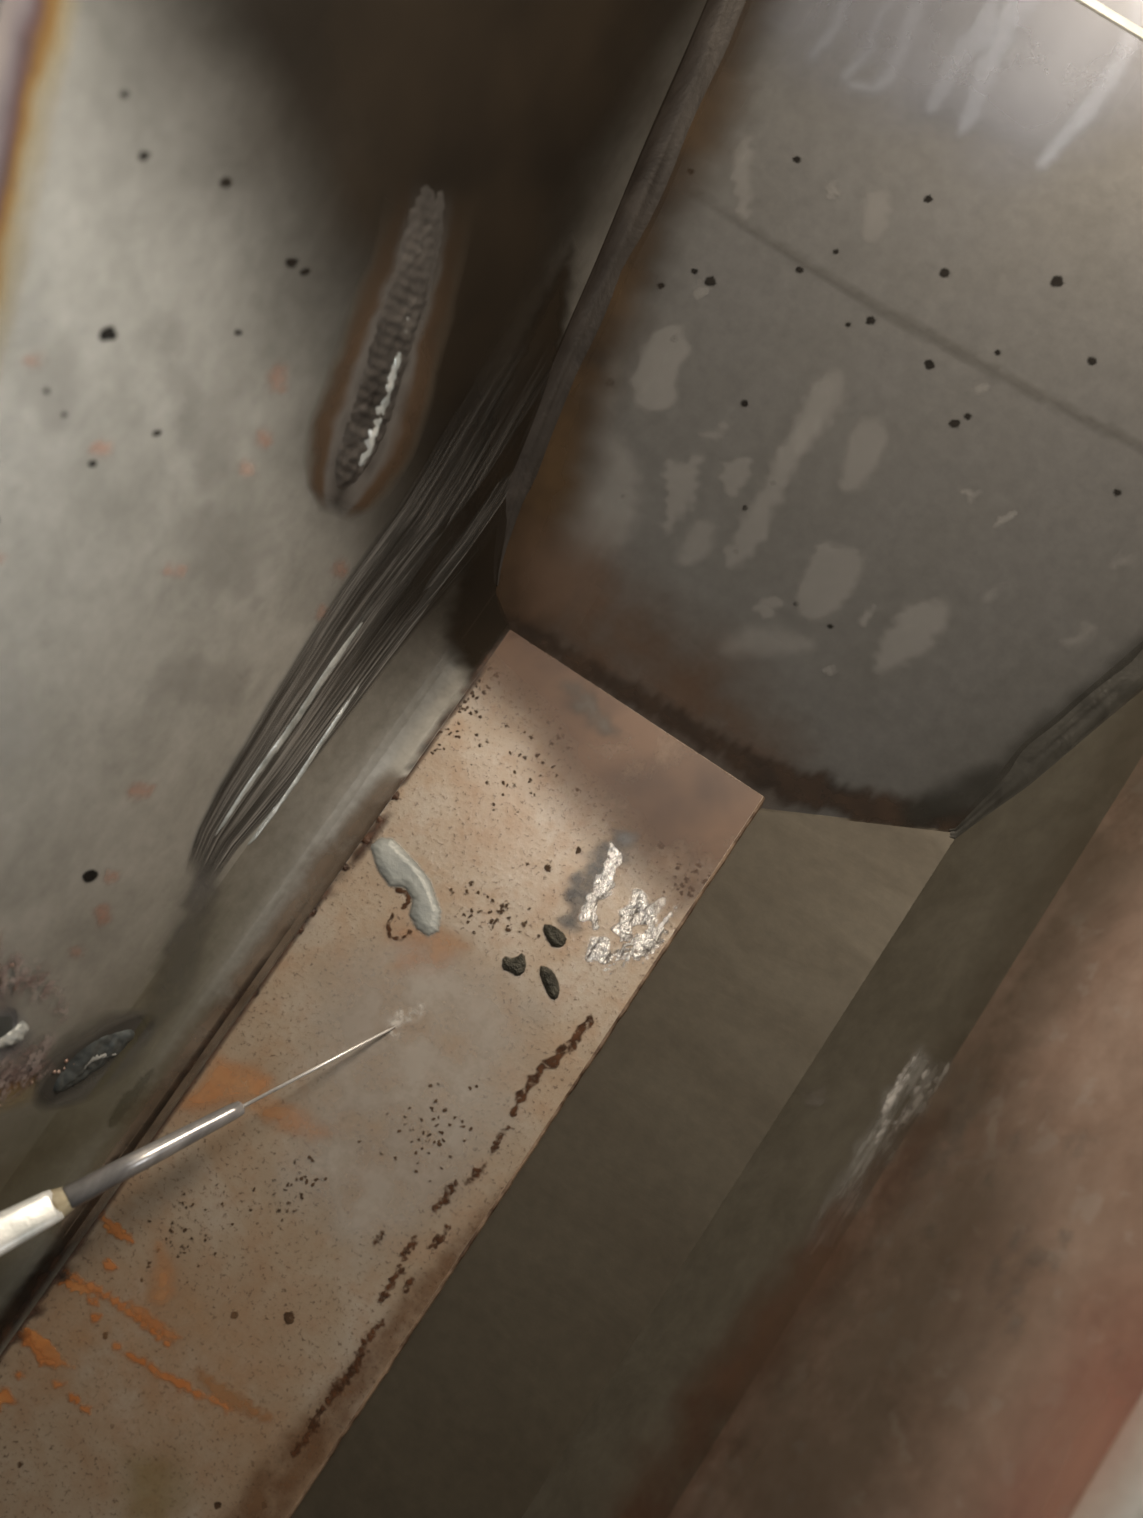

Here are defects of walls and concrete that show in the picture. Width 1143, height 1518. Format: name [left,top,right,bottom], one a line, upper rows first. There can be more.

water stain [800,0,1143,166]
corrosion [92,778,396,1172]
water stain [876,1063,949,1141]
corrosion [56,1186,134,1243]
corrosion [58,1269,179,1347]
corrosion [20,1328,90,1414]